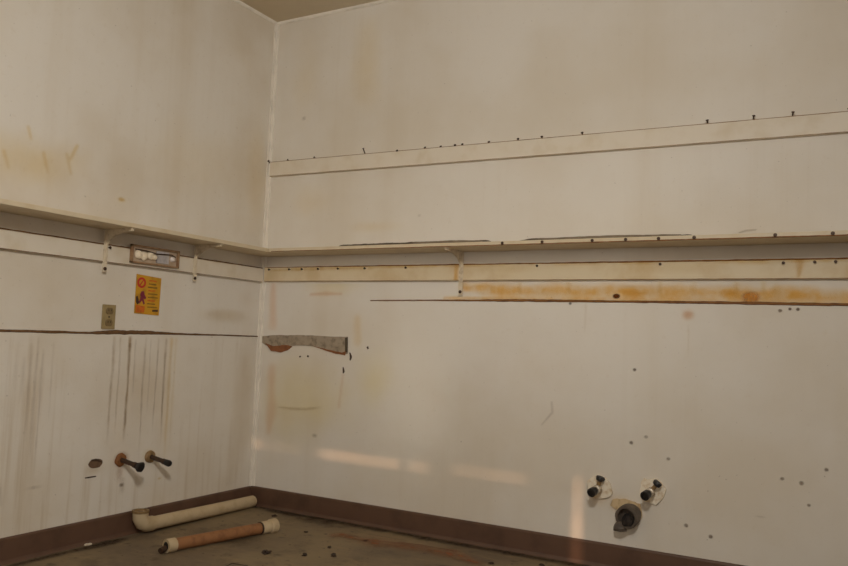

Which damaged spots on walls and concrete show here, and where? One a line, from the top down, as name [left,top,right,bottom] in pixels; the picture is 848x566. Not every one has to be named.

rust [180,255,848,269]
peeling [262,335,352,360]